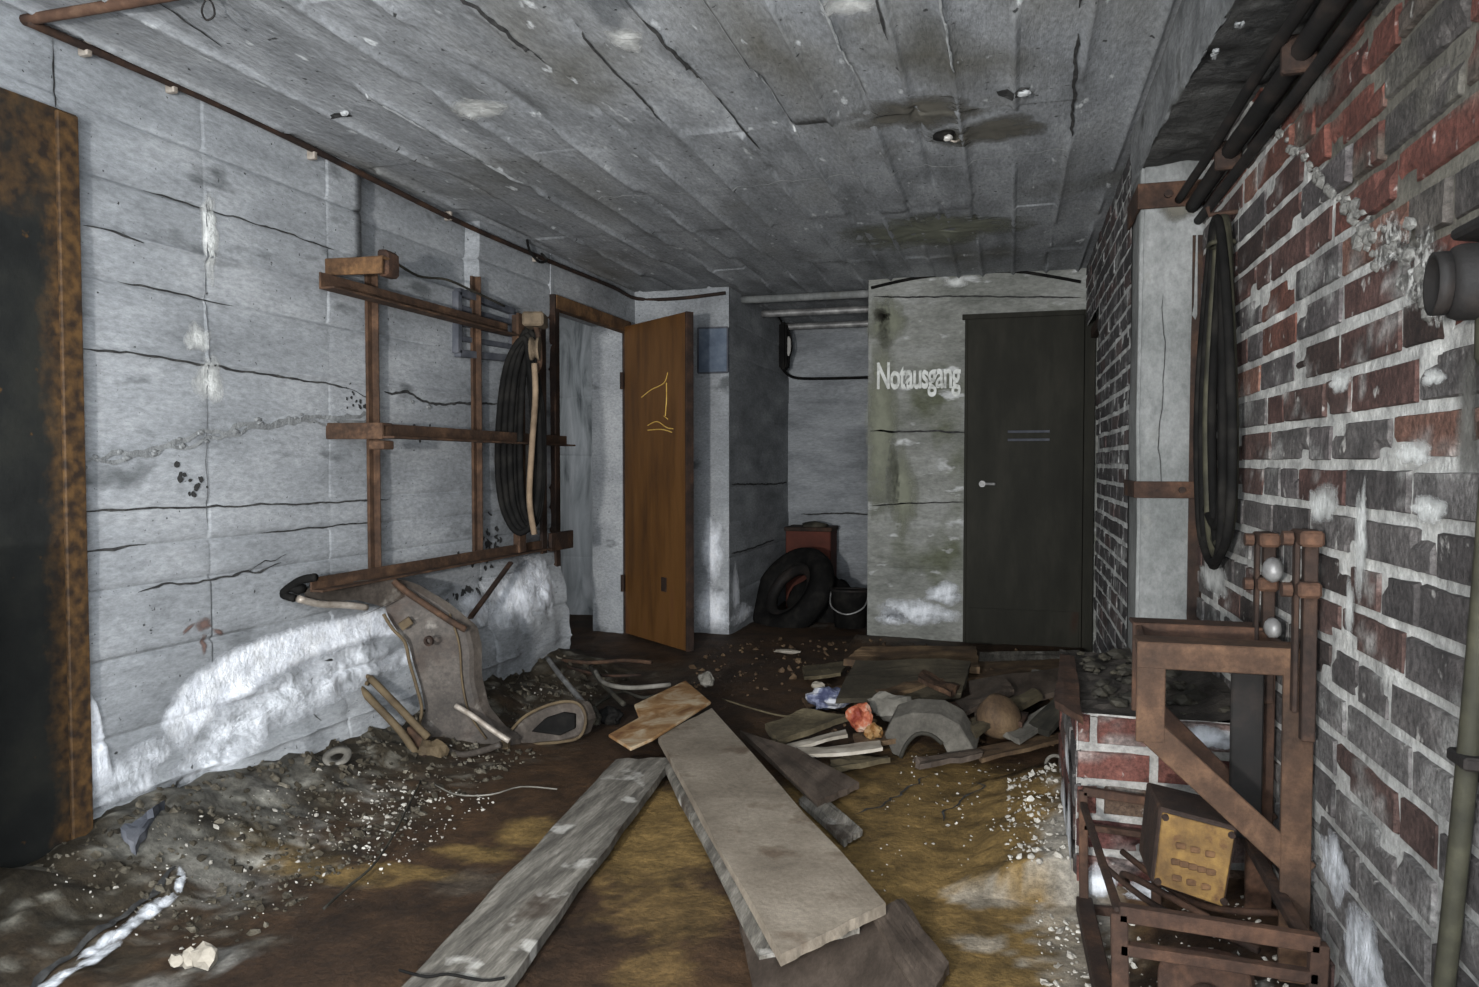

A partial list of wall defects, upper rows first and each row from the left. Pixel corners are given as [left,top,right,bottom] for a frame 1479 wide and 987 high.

crack [460,0,544,62]
crack [599,0,1082,199]
water stain [463,561,553,626]
water stain [91,609,413,804]